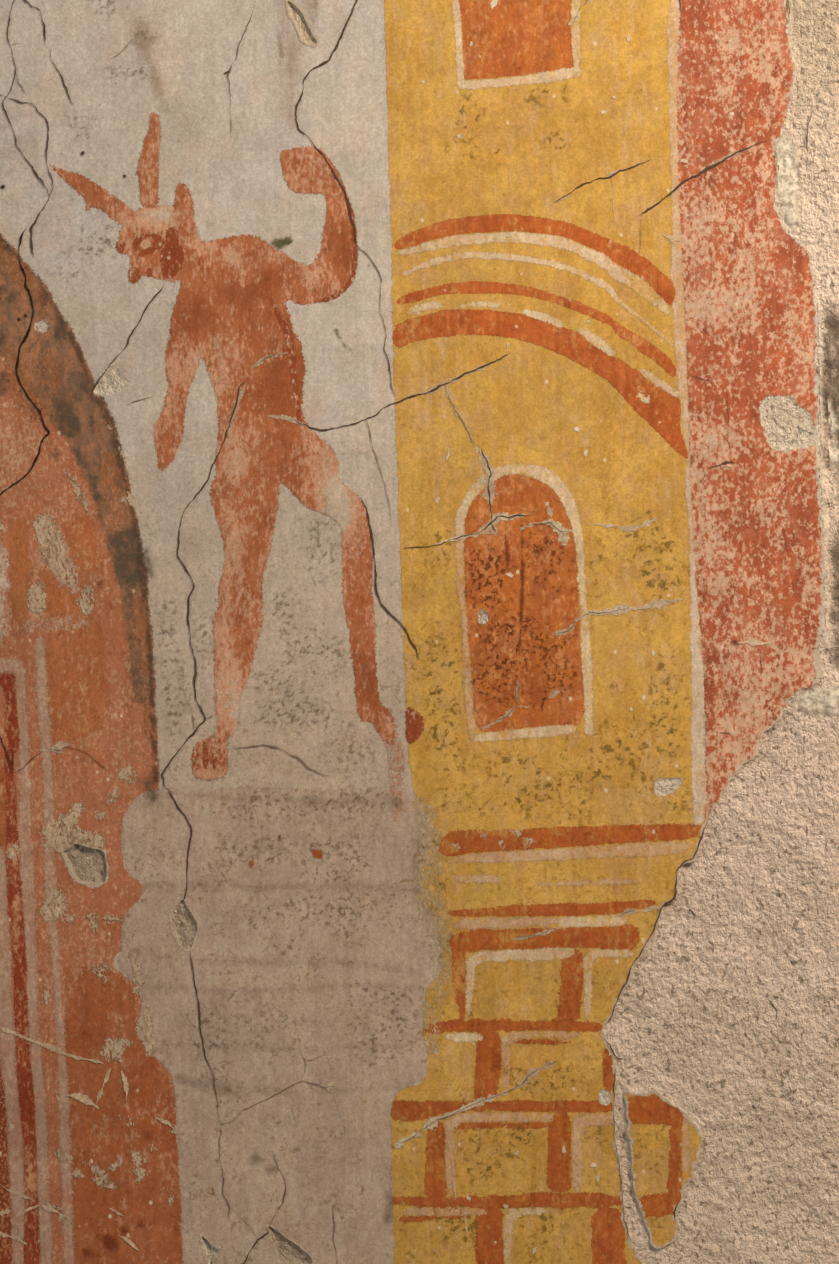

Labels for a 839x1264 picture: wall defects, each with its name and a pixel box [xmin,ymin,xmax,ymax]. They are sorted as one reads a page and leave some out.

crack [0,0,76,496]
crack [613,140,776,246]
damp [777,136,800,229]
crack [268,0,658,659]
damp [818,304,839,489]
crack [161,352,286,901]
flaking render [599,0,839,1264]
damp [793,686,839,714]
damp [821,513,839,662]
peeling [39,764,137,889]
peeling [53,1141,158,1189]
flaking render [266,1223,315,1264]